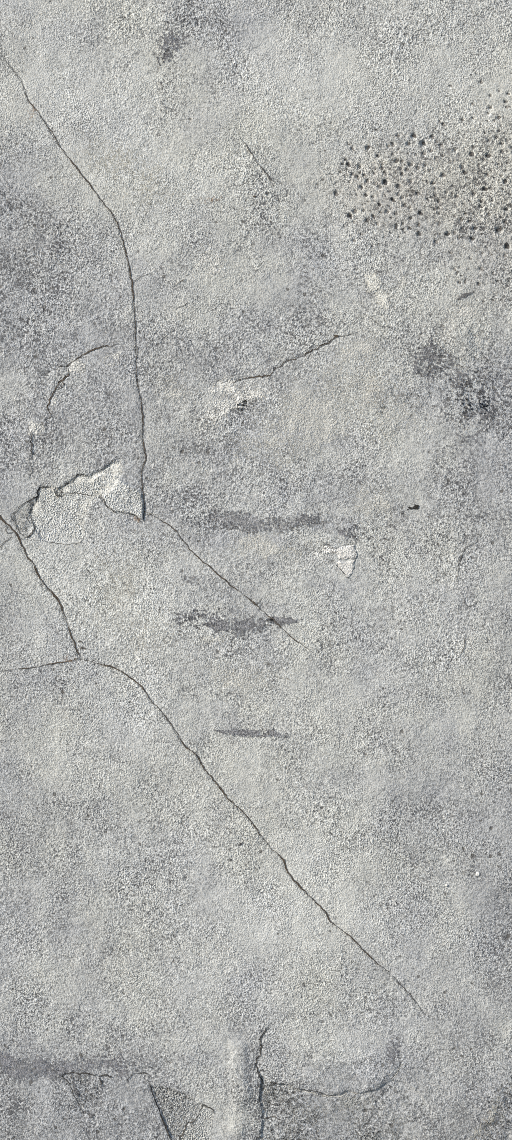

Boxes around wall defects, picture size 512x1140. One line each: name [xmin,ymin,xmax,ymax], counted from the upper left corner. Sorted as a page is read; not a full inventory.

crack [2,56,322,660]
crack [221,331,358,383]
crack [0,516,425,1014]